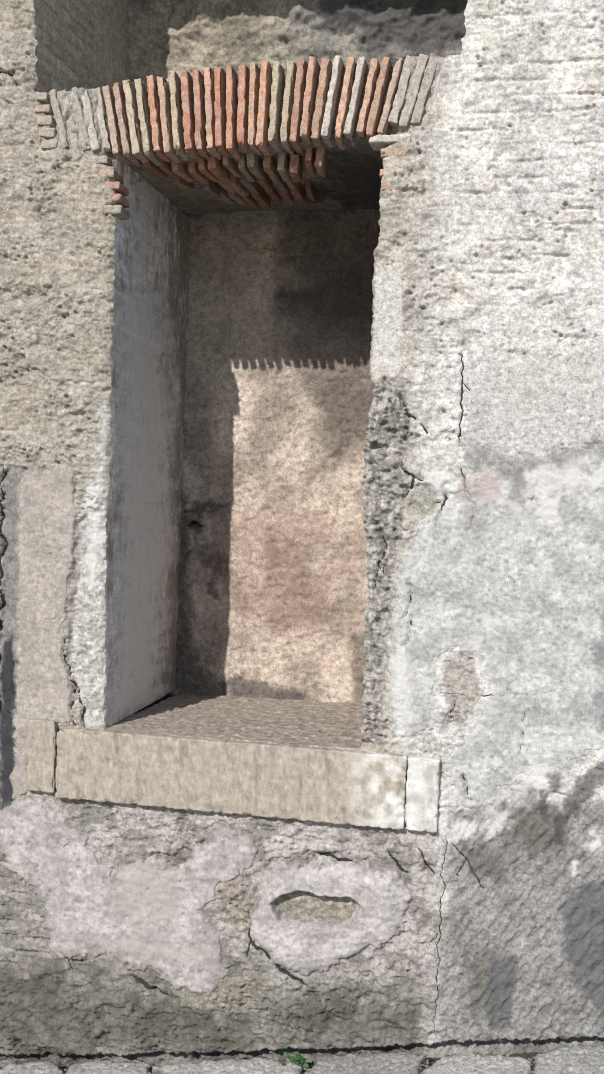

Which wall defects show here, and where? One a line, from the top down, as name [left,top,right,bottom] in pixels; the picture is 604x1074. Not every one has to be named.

crack [458,354,470,441]
crack [400,402,476,522]
damp [1,637,14,691]
damp [388,631,415,753]
damp [437,762,571,842]
damp [585,830,604,855]
crack [246,922,306,985]
crack [319,840,484,1031]
damp [490,956,515,1027]
damp [564,886,604,1008]